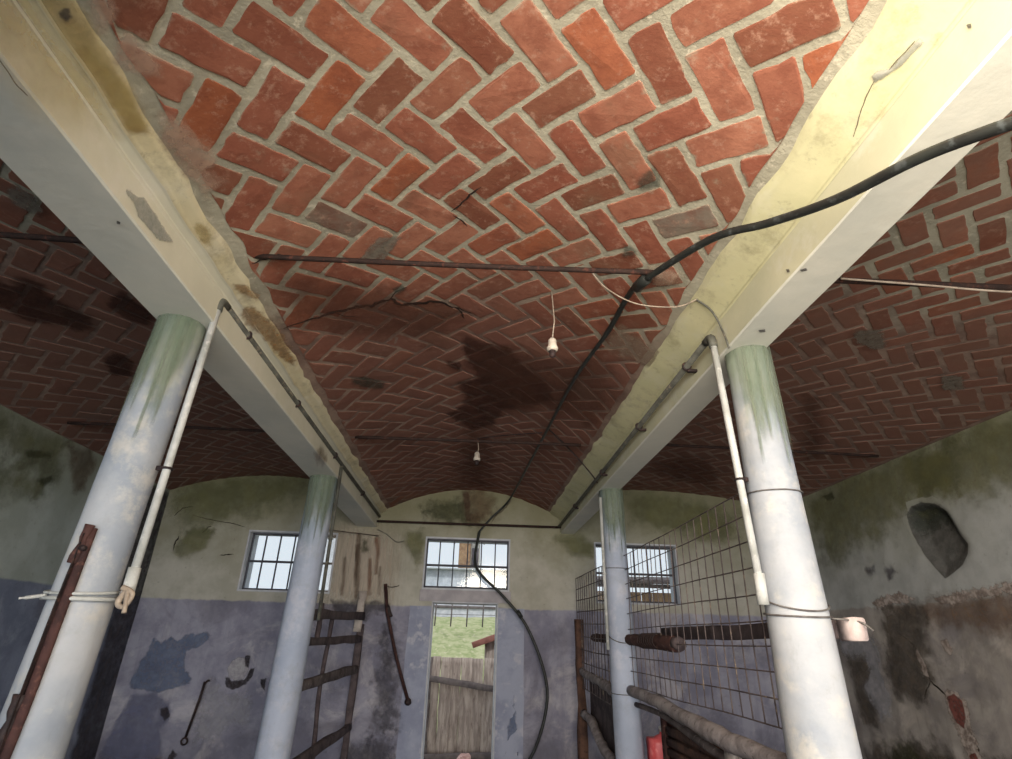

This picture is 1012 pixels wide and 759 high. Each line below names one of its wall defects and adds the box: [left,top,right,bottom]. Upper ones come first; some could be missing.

water stain [0,278,91,330]
water stain [105,292,191,430]
corrosion [236,285,295,363]
crack [283,287,471,329]
water stain [448,338,552,428]
spalling [907,503,968,578]
peeling [934,582,1012,606]
peeling [104,632,209,759]
spalling [945,689,982,759]